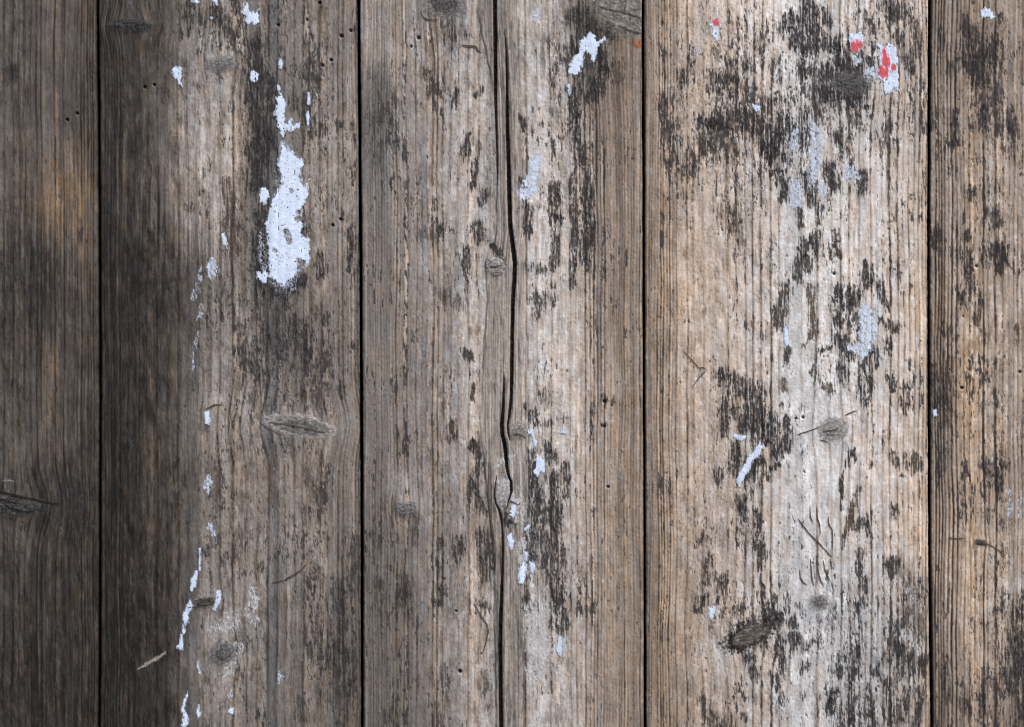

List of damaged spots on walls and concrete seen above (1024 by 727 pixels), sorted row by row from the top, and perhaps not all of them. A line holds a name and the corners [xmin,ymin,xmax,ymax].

peeling [852,55,878,82]
peeling [259,167,303,205]
peeling [256,232,301,287]
crack [461,0,526,727]